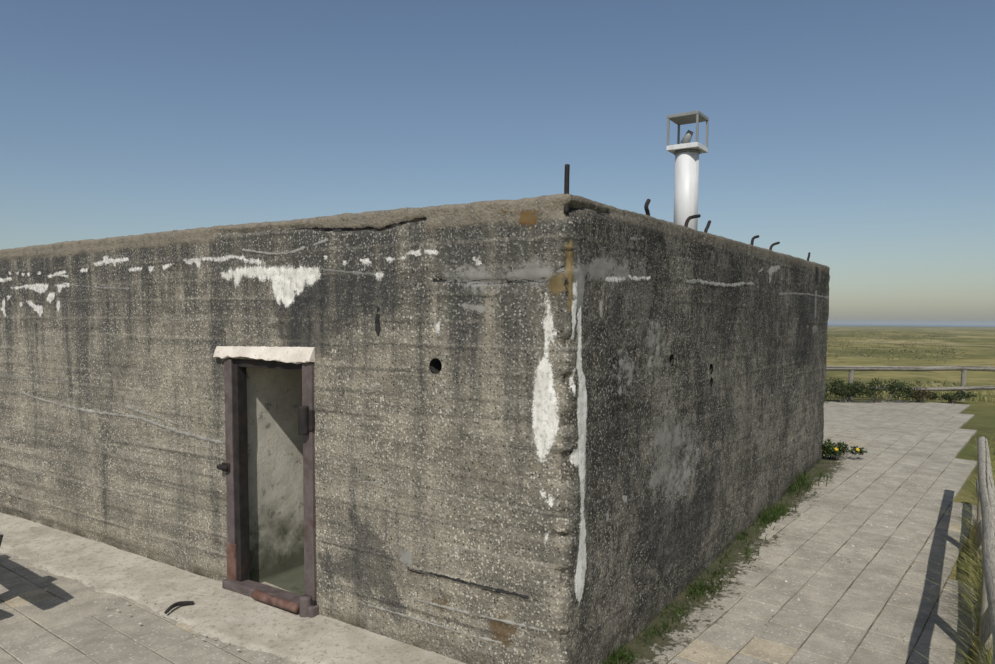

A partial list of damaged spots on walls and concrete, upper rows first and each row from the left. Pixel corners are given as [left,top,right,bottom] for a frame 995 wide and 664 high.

crack [280,217,426,232]
rust [548,240,575,313]
efflorescence [443,258,645,607]
crack [408,568,529,599]